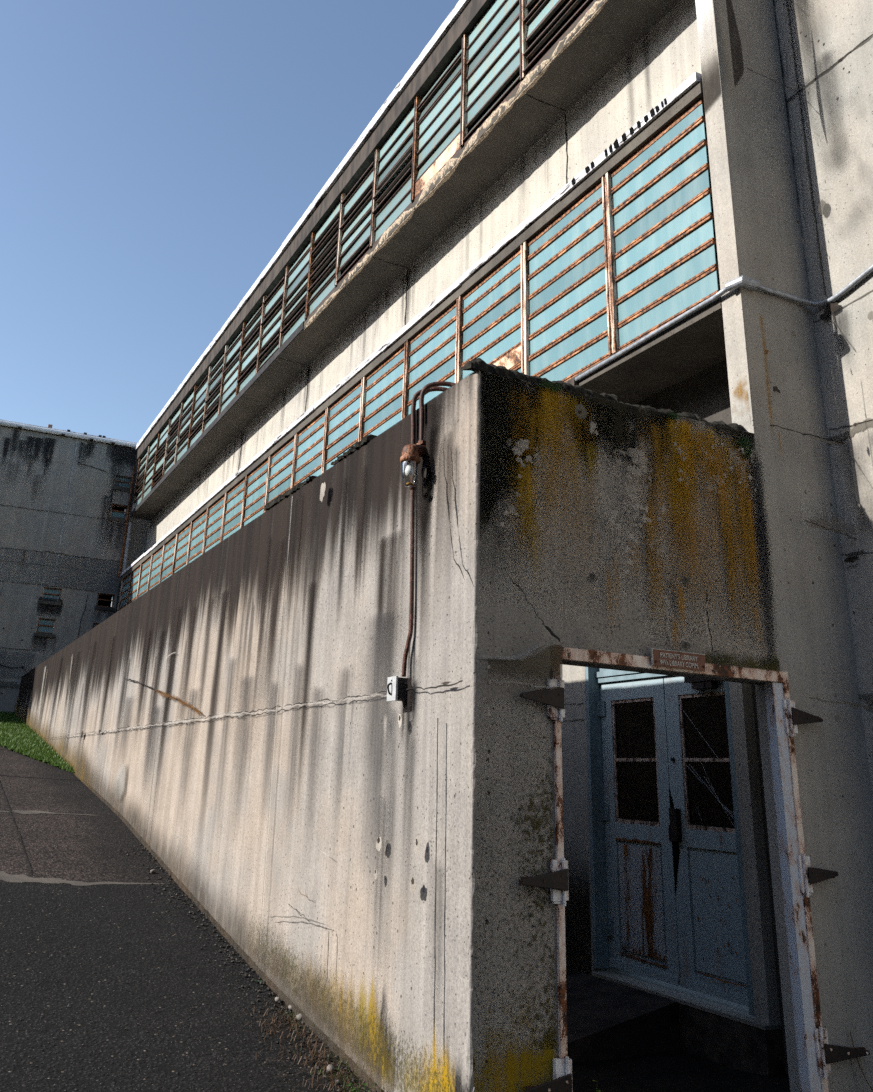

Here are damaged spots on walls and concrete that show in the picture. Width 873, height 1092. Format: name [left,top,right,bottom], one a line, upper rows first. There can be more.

leakage [702,61,721,112]
leakage [726,0,744,86]
crack [787,34,873,102]
leakage [3,429,55,470]
crack [770,418,873,446]
leakage [743,437,773,653]
leakage [14,381,459,833]
crack [508,576,561,643]
corrosion [616,837,667,968]
leakage [329,983,384,1074]
leakage [406,1041,455,1092]
leakage [474,1039,556,1092]